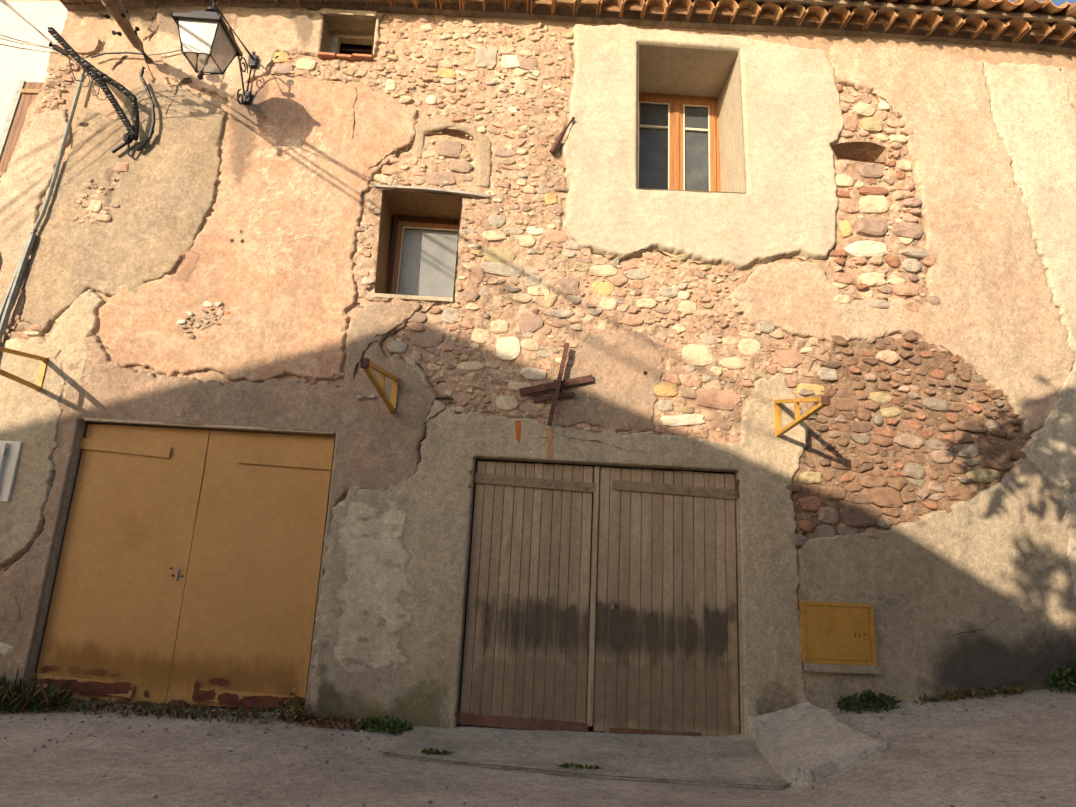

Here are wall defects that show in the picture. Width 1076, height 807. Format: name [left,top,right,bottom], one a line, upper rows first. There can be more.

spalling [71,162,129,226]
spalling [269,15,1032,547]
spalling [176,299,225,339]
crack [353,301,451,379]
rust [30,665,151,706]
rust [168,678,305,713]